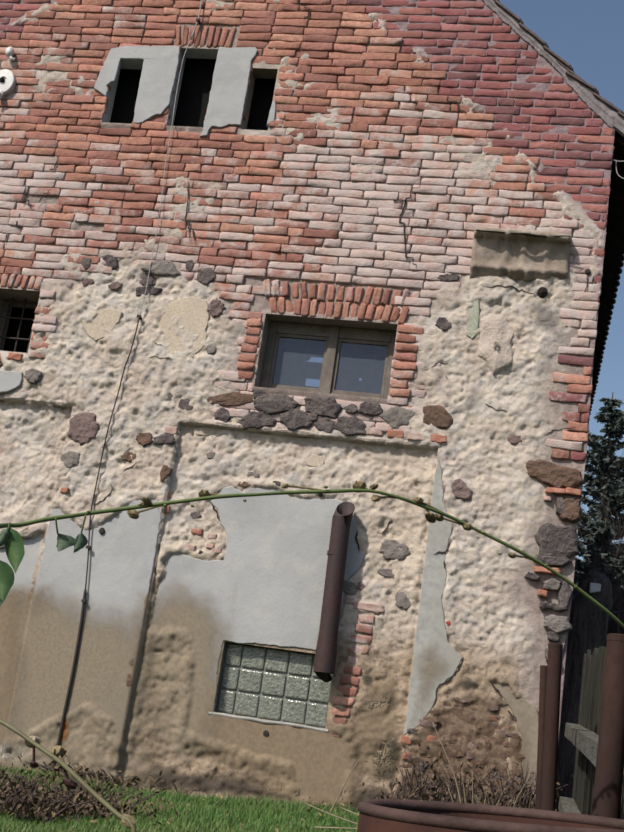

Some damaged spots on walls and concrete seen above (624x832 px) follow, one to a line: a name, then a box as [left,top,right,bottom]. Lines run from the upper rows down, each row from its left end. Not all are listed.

peeling [94,46,181,124]
peeling [200,47,258,137]
peeling [266,99,276,128]
crack [393,186,420,267]
spalling [438,274,460,282]
spalling [435,317,452,331]
spalling [60,412,100,468]
spalling [136,426,178,447]
peeling [0,472,342,712]
spalling [377,539,411,578]
peeling [395,460,539,805]
damp [0,591,398,805]